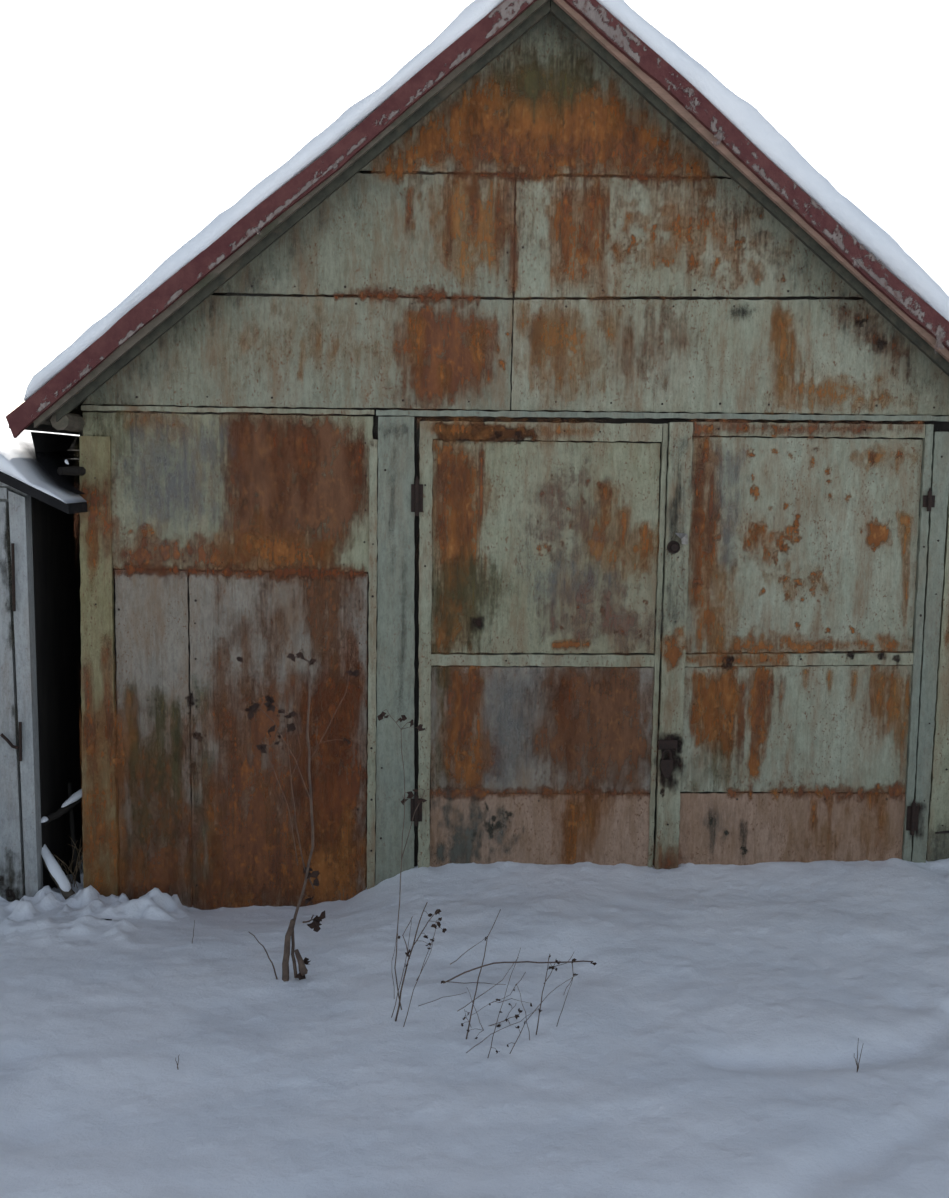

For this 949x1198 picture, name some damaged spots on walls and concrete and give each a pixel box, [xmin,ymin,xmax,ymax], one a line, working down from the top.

peeling [486,0,533,38]
peeling [573,0,661,63]
peeling [376,48,471,125]
peeling [198,137,366,279]
peeling [711,116,949,349]
peeling [119,289,182,345]
peeling [37,356,104,412]
rust [334,61,923,864]
rust [74,407,369,910]
rust [657,846,682,869]